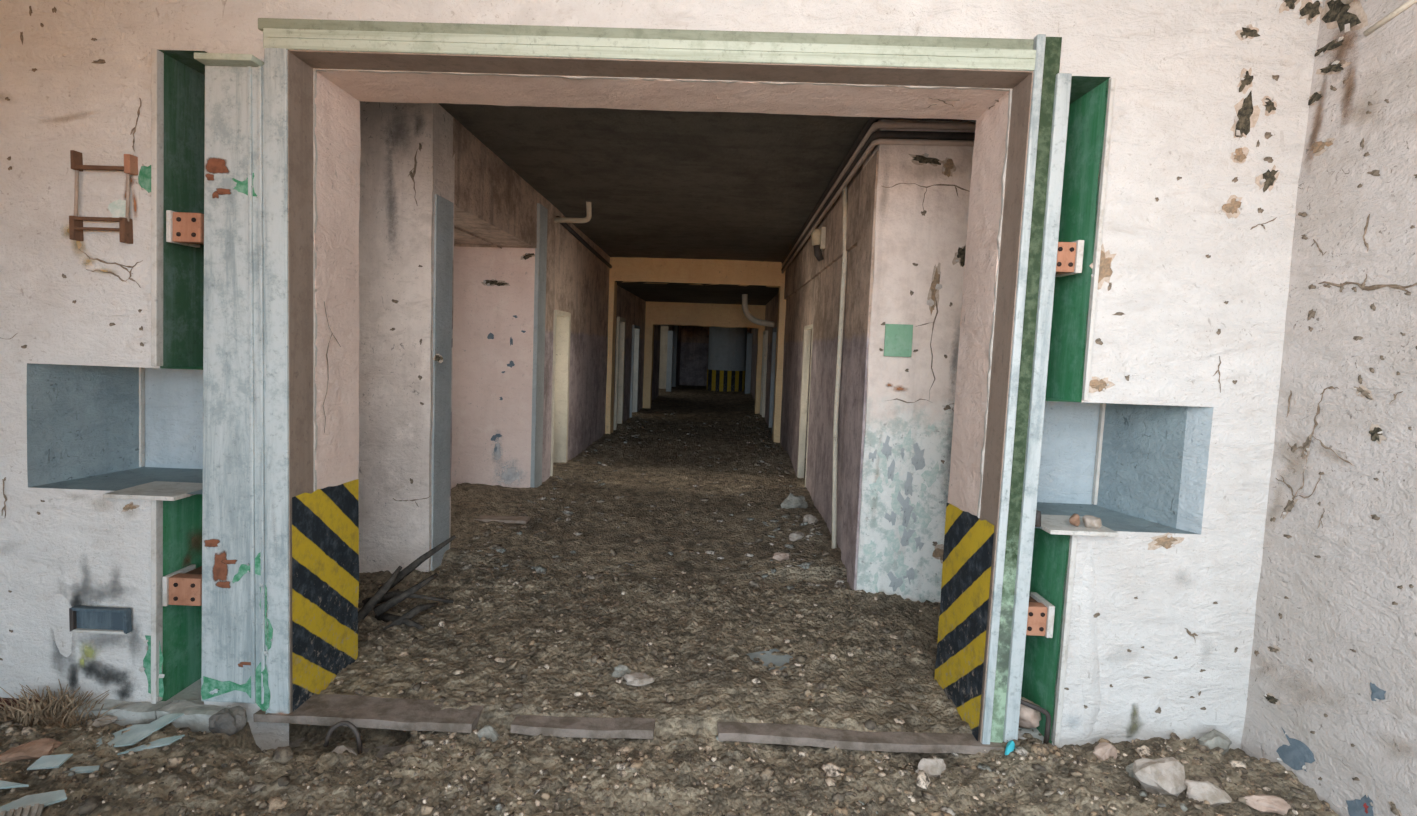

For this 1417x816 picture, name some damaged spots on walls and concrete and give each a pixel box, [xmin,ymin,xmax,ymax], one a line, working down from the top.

spalling [1235,24,1261,41]
spalling [1279,0,1368,106]
spalling [1221,68,1280,219]
spalling [1310,138,1335,156]
crack [79,249,143,287]
crack [1312,214,1417,293]
corrosion [184,534,237,588]
damp [72,575,117,606]
damp [55,647,130,699]
peeling [1365,682,1386,701]
peeling [1276,727,1323,780]
peeling [1344,777,1402,816]